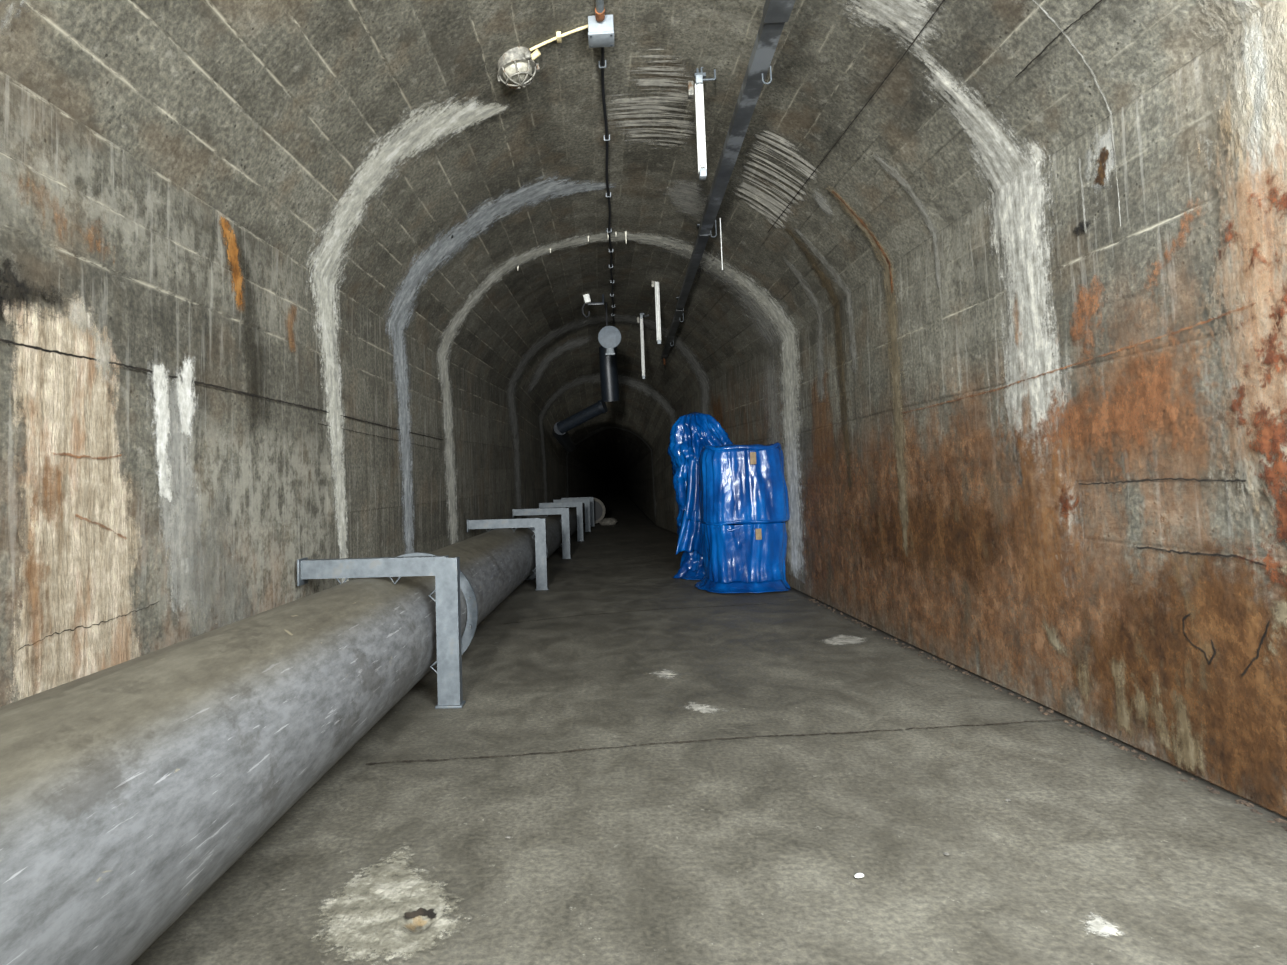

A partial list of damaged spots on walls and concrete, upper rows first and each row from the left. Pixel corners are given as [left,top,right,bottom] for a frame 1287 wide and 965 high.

rust [220,216,243,309]
water stain [225,237,268,428]
water stain [1032,0,1121,233]
rust [1087,130,1114,186]
water stain [1192,0,1287,536]
rust [1247,176,1287,221]
water stain [151,357,207,615]
rust [800,220,1287,817]
crack [1079,477,1246,485]
crack [1136,546,1285,570]